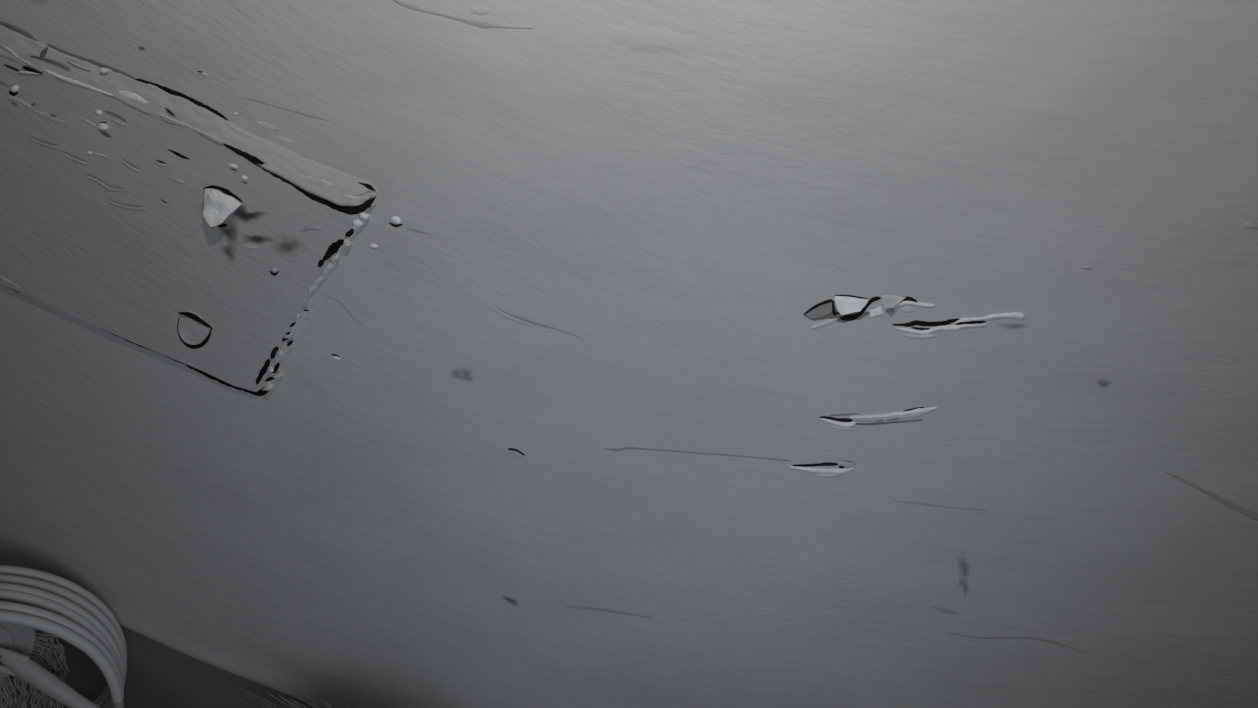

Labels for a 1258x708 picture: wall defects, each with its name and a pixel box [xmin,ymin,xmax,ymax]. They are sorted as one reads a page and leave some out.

crack [394,0,534,29]
flaking render [203,185,259,254]
spalling [256,212,370,391]
peeling [804,294,935,329]
crack [1165,472,1258,521]